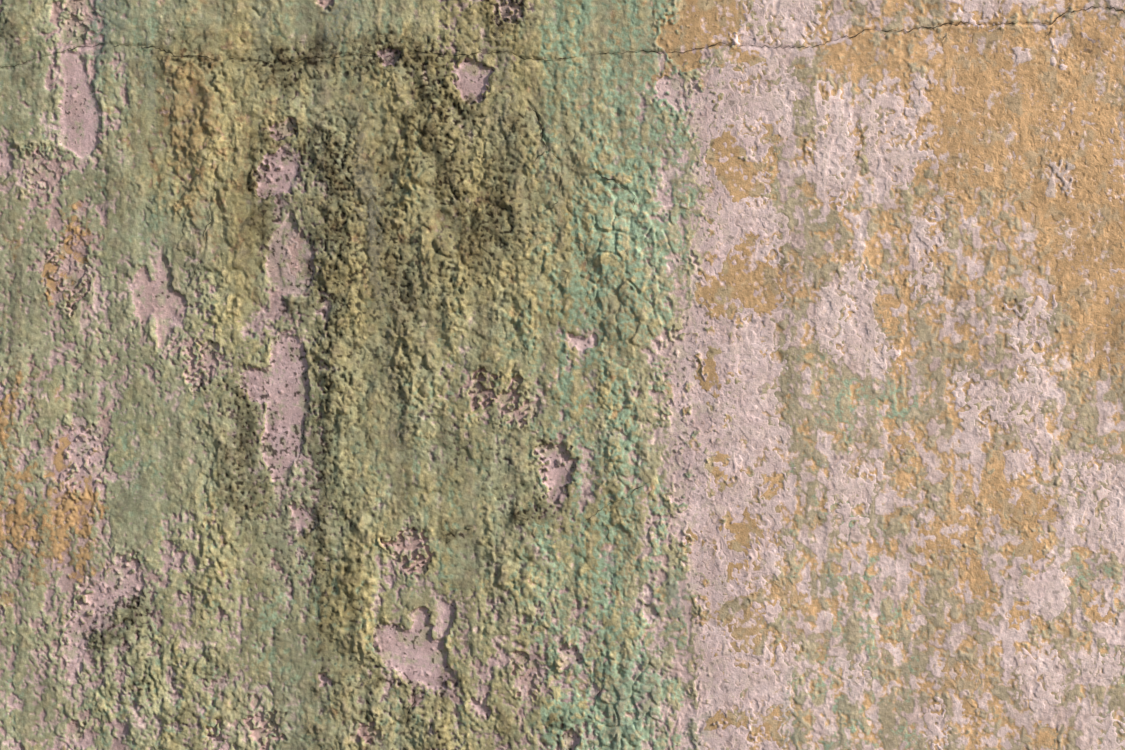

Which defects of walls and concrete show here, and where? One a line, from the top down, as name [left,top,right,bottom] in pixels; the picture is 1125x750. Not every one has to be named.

peeling [57,0,102,158]
water stain [270,48,317,88]
water stain [331,30,477,119]
crack [6,0,1125,68]
peeling [253,117,301,199]
peeling [265,211,315,294]
water stain [296,123,350,246]
water stain [458,178,512,250]
peeling [239,330,311,483]
peeling [651,0,1125,750]
peeling [533,443,578,505]
peeling [373,600,455,694]